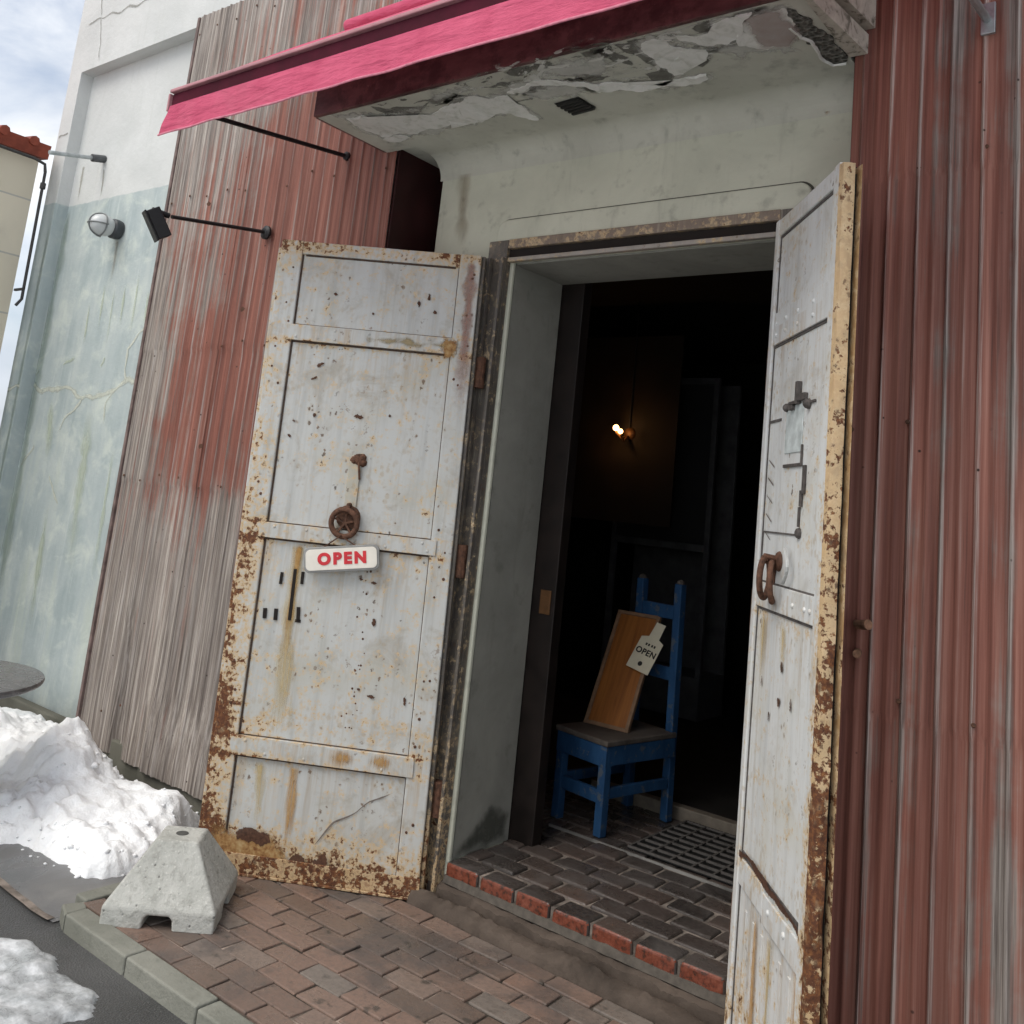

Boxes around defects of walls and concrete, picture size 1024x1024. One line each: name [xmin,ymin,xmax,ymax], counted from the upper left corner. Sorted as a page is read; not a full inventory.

crack [90,0,145,50]
peeling [338,6,848,142]
crack [7,328,144,421]
corrosion [280,547,301,689]
corrosion [213,827,285,860]
corrosion [285,769,296,830]
crack [315,795,388,844]